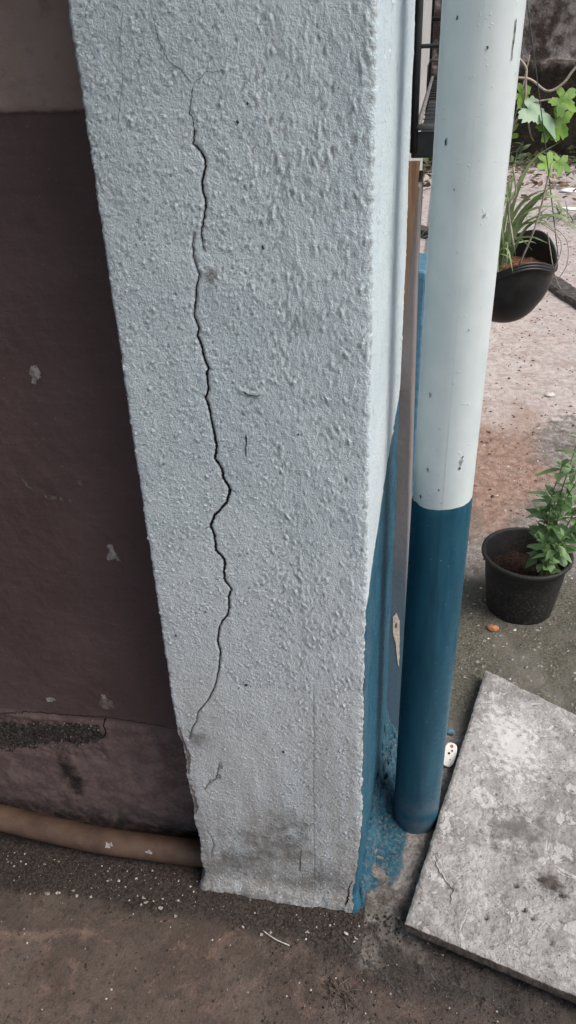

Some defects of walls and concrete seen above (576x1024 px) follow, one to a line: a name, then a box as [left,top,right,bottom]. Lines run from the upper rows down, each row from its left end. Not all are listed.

peeling [29,365,41,384]
crack [0,5,236,736]
peeling [107,544,121,561]
spalling [0,719,104,752]